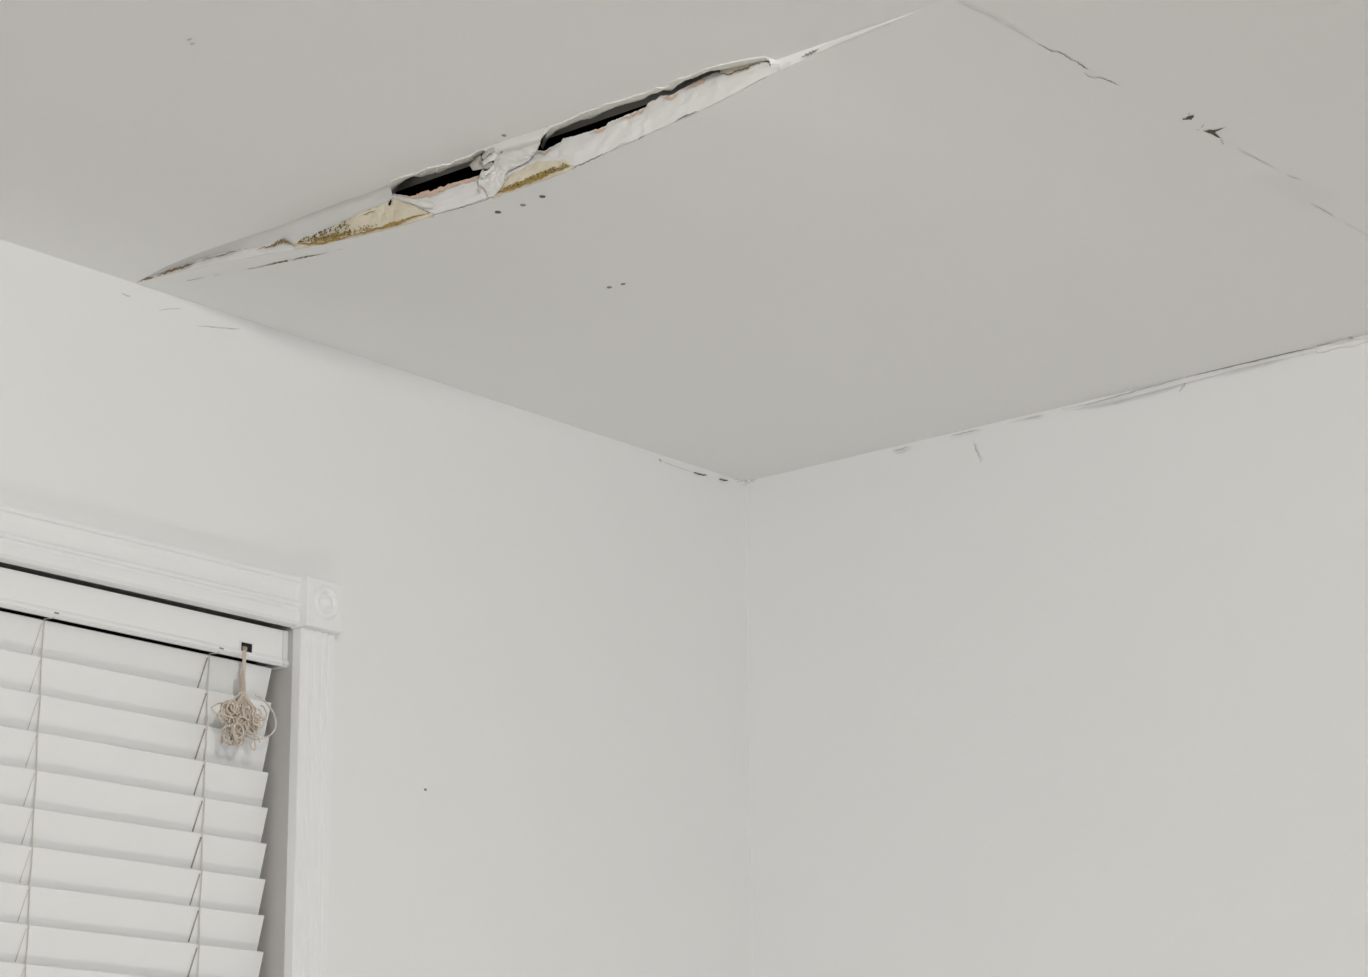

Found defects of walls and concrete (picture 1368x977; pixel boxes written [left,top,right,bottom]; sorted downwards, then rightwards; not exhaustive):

crack [962,2,1115,84]
spalling [541,56,770,149]
spalling [388,147,503,194]